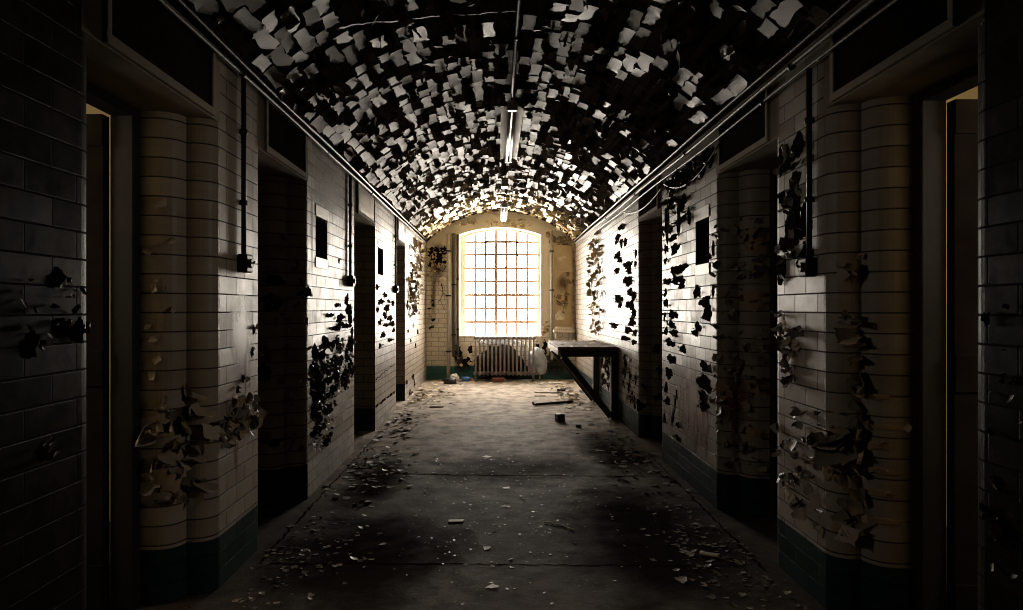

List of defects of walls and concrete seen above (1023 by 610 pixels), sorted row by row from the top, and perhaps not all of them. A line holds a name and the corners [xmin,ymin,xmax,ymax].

peeling [18,267,91,359]
peeling [135,235,357,508]
peeling [189,0,860,538]